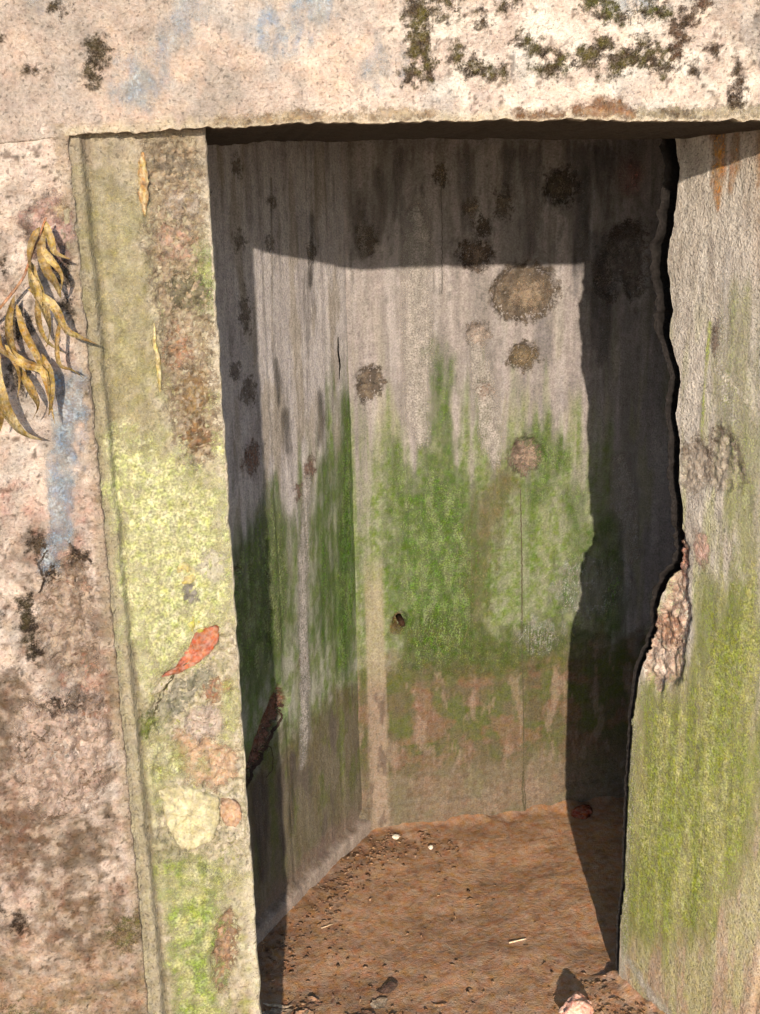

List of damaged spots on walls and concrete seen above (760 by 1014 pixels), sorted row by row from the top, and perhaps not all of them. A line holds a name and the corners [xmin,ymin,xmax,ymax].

rust [711,134,739,209]
damp [275,360,288,434]
damp [290,401,356,823]
damp [470,334,511,558]
damp [559,454,639,639]
damp [621,698,669,1012]
crack [615,139,685,971]
peeling [622,533,760,962]
damp [685,585,756,924]